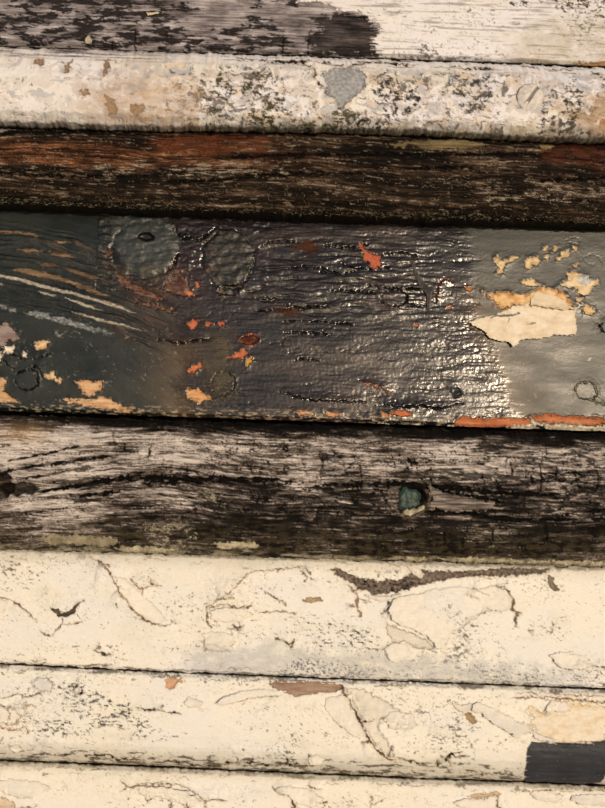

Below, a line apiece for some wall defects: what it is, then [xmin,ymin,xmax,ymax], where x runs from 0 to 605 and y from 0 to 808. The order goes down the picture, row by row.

peeling [0,0,382,58]
peeling [469,246,599,347]
peeling [0,322,49,361]
peeling [0,378,17,403]
peeling [64,380,137,413]
crack [98,560,166,626]
crack [206,566,311,630]
crack [350,586,363,617]
crack [499,586,520,627]
peeling [216,679,418,757]
crack [338,685,465,775]
peeling [452,699,605,744]